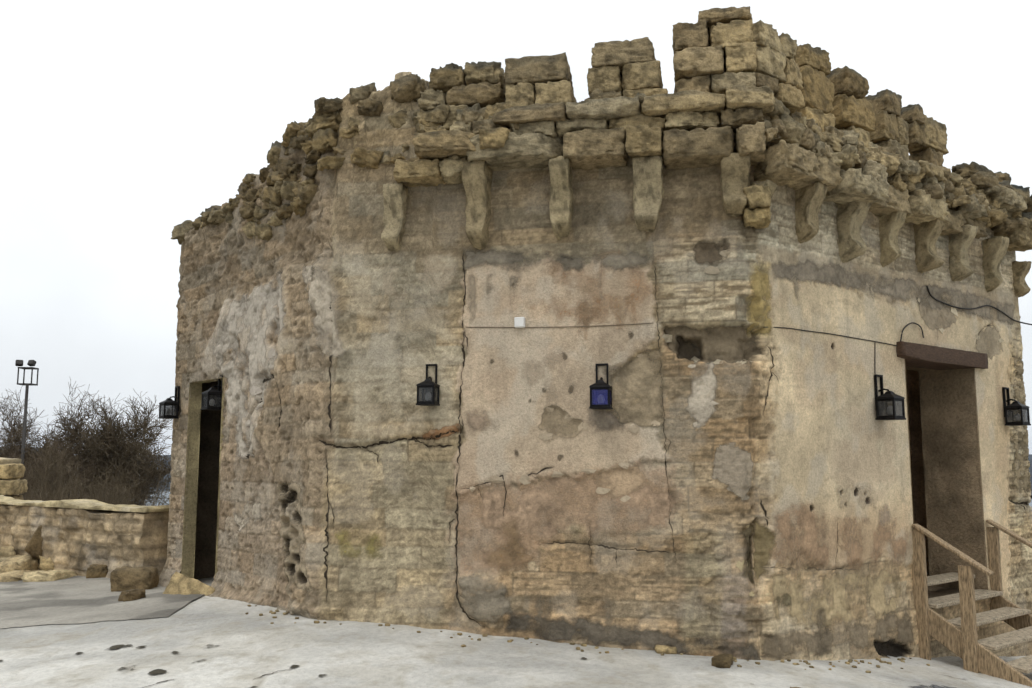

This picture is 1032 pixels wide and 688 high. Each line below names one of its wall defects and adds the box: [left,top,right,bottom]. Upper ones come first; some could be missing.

spalling [687,240,731,274]
peeling [609,325,762,434]
crack [764,348,778,410]
crack [319,252,553,627]
crack [547,263,680,562]
water stain [506,597,833,660]
spalling [828,639,912,673]
water stain [846,602,914,649]